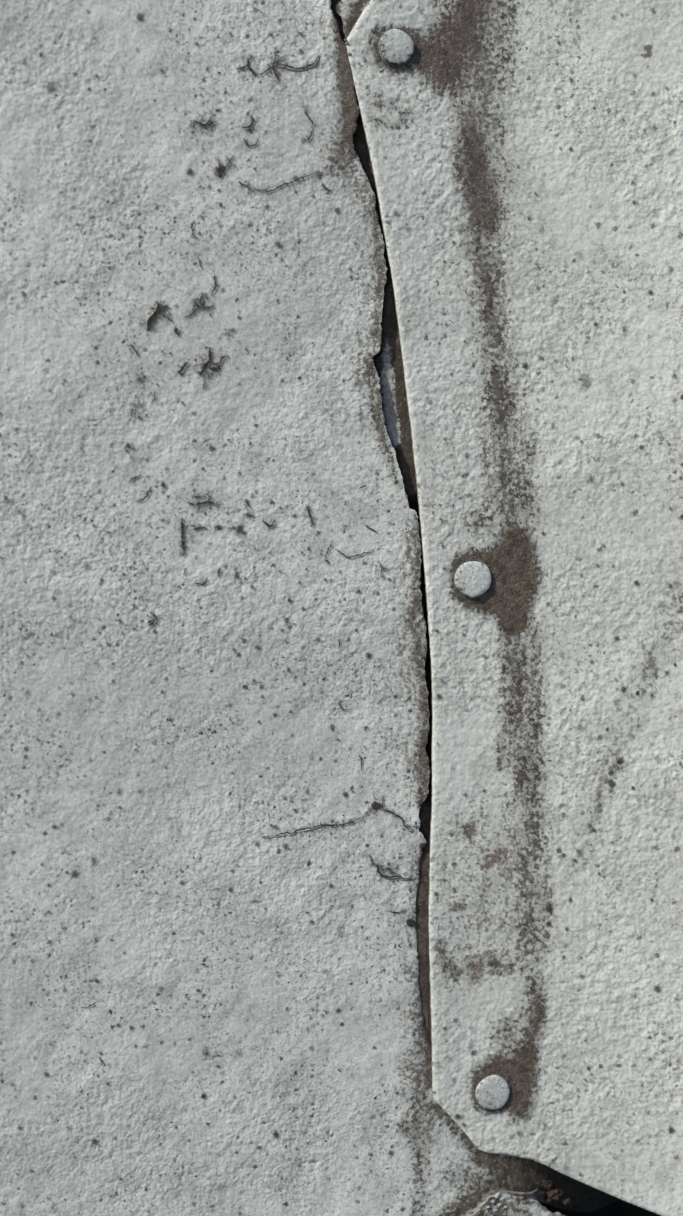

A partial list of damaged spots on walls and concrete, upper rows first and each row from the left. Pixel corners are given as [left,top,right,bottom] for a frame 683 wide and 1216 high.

crack [237,31,321,142]
crack [188,115,331,196]
crack [174,493,277,587]
crack [305,505,387,572]
rust [367,0,552,1123]
crack [262,754,418,839]
crack [368,855,415,913]
crack [425,941,433,1055]